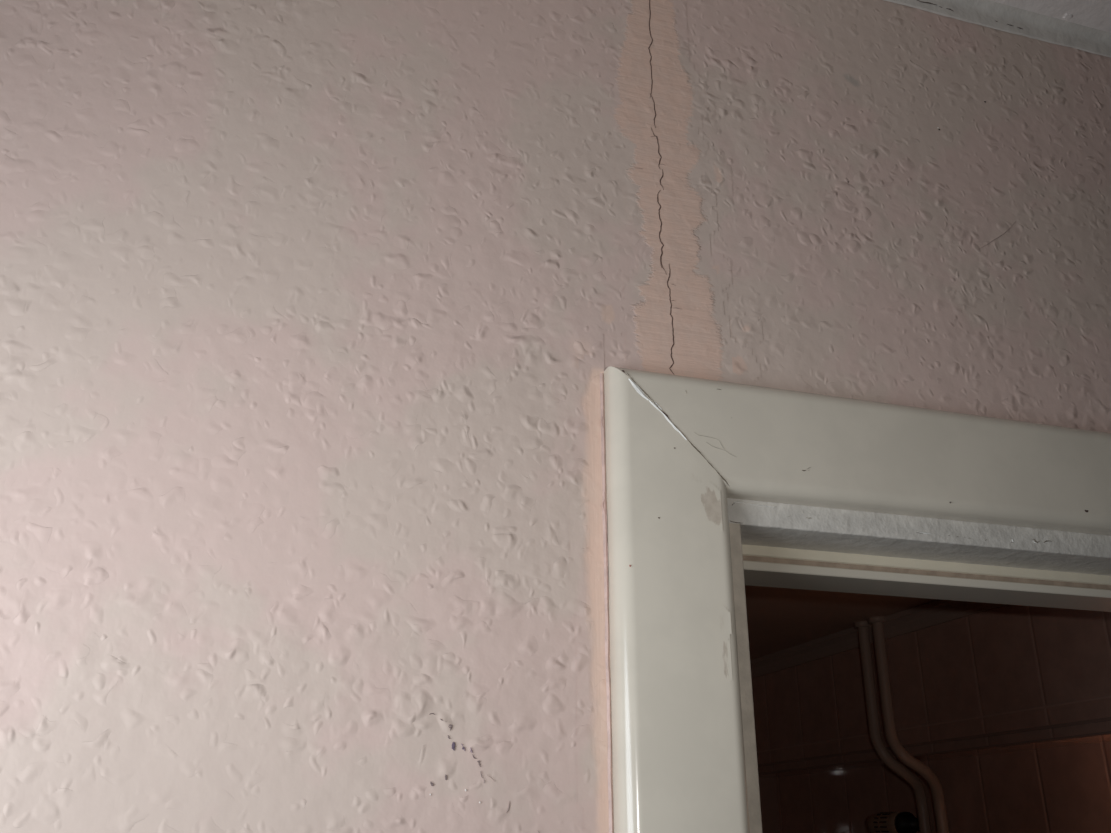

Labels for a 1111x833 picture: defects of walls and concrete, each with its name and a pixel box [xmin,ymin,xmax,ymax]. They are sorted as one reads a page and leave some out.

crack [639,0,680,374]